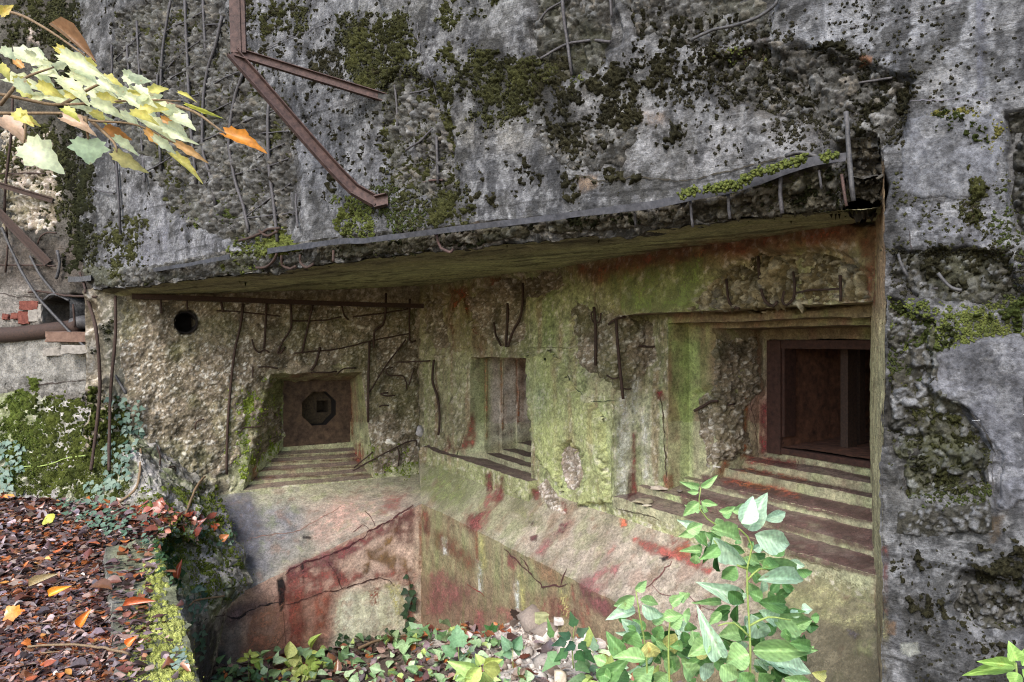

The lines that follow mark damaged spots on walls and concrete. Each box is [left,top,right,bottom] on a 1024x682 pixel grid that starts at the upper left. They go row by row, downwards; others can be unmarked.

spalling [82,0,1024,478]
crack [199,505,413,650]
corrosion [242,474,503,657]
crack [504,549,568,588]
corrosion [633,538,712,574]